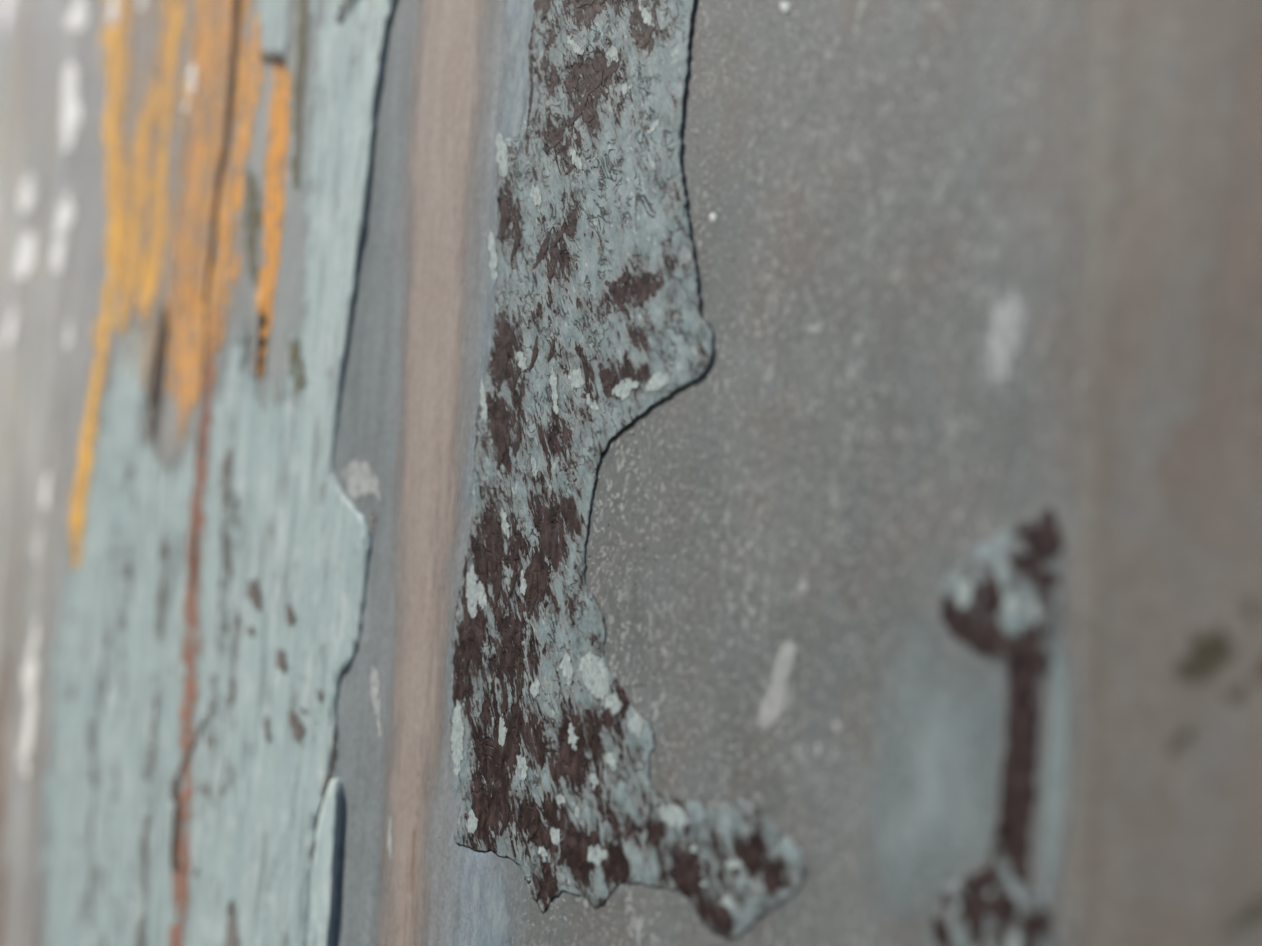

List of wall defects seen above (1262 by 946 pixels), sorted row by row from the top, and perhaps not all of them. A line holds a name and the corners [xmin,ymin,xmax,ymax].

peeling [12,172,36,281]
rust [69,0,291,946]
peeling [18,0,397,946]
peeling [449,0,808,940]
peeling [930,508,1064,946]